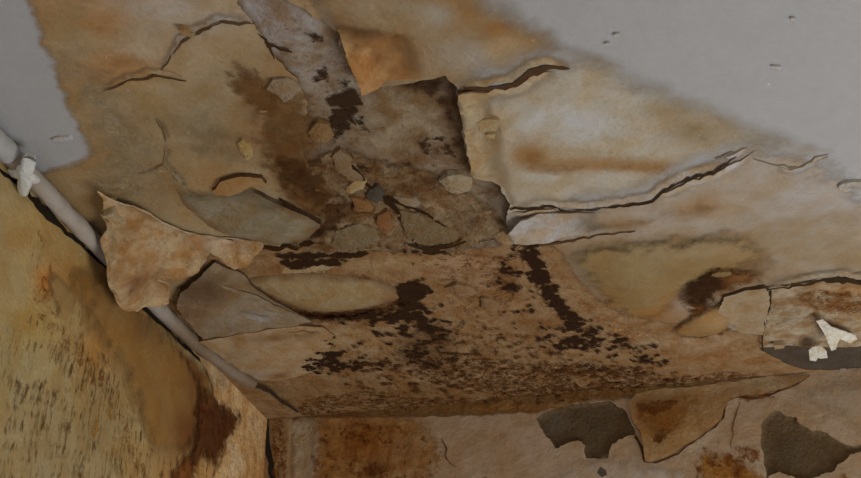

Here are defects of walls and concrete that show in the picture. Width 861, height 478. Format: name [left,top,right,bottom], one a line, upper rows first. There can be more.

crack [103,15,292,91]
leakage [288,0,556,88]
crack [457,56,570,99]
leakage [28,0,382,274]
spalling [237,0,513,245]
crack [510,147,828,217]
leakage [291,62,861,410]
leakage [0,162,226,478]
peeling [97,191,861,463]
corrosion [311,414,439,478]
corrosion [696,446,762,478]
spalling [760,411,861,478]